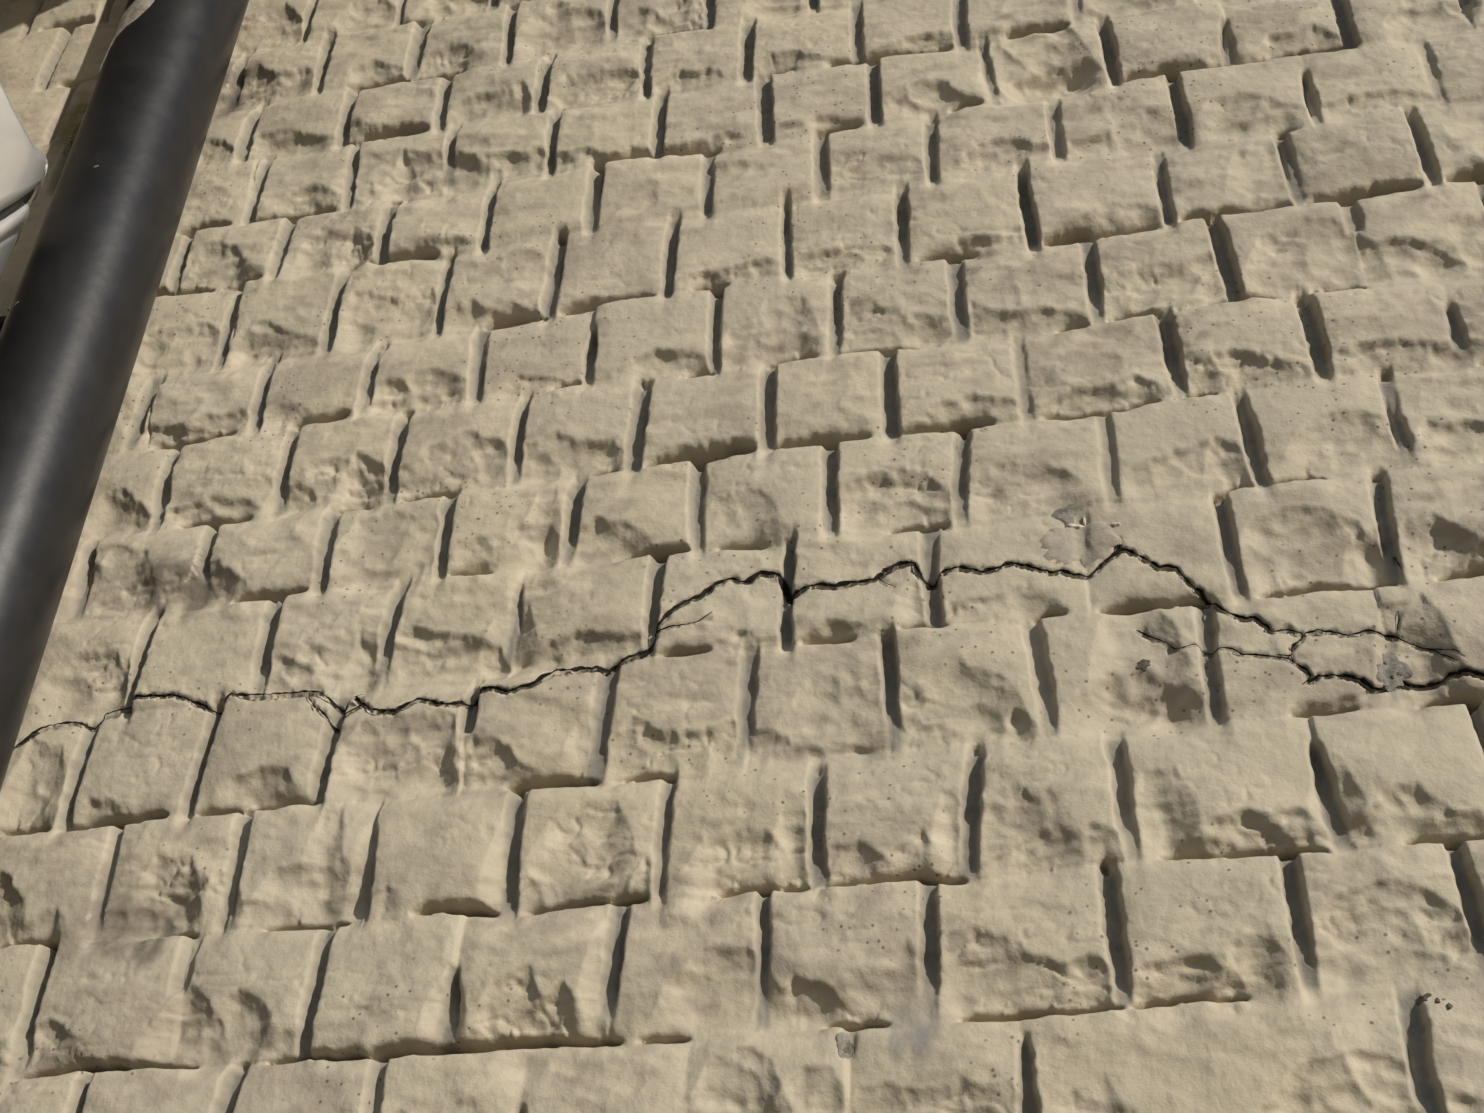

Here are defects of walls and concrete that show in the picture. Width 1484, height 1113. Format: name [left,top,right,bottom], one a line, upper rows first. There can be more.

crack [14,543,1484,748]